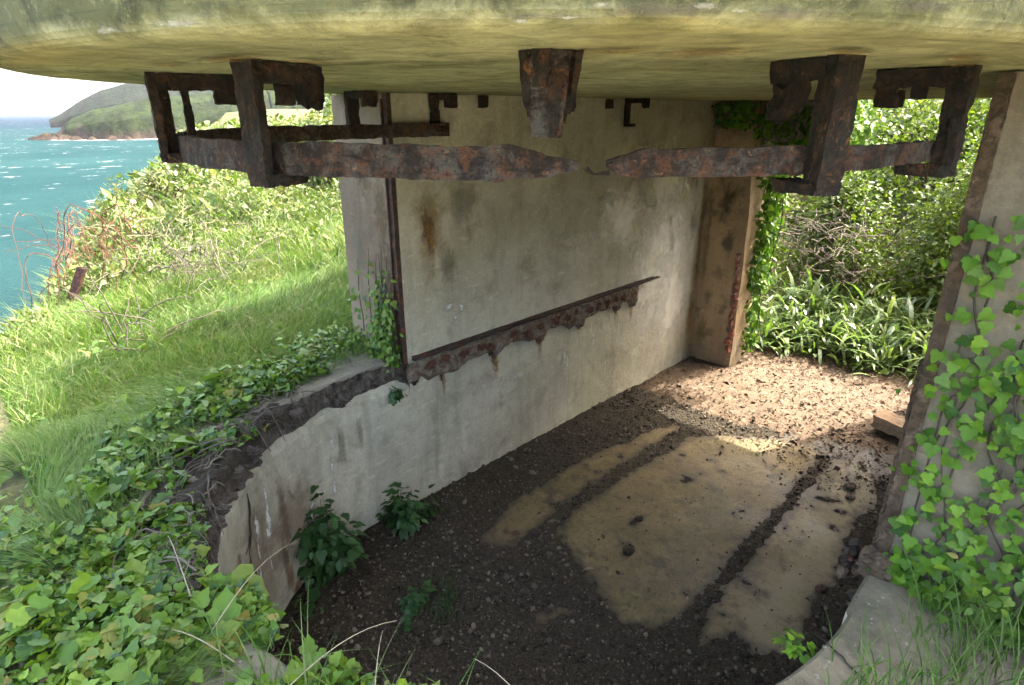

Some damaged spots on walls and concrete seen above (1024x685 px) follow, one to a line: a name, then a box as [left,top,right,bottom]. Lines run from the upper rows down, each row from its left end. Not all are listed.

corrosion [420,201,438,256]
crack [245,494,258,575]
damp [255,489,288,577]